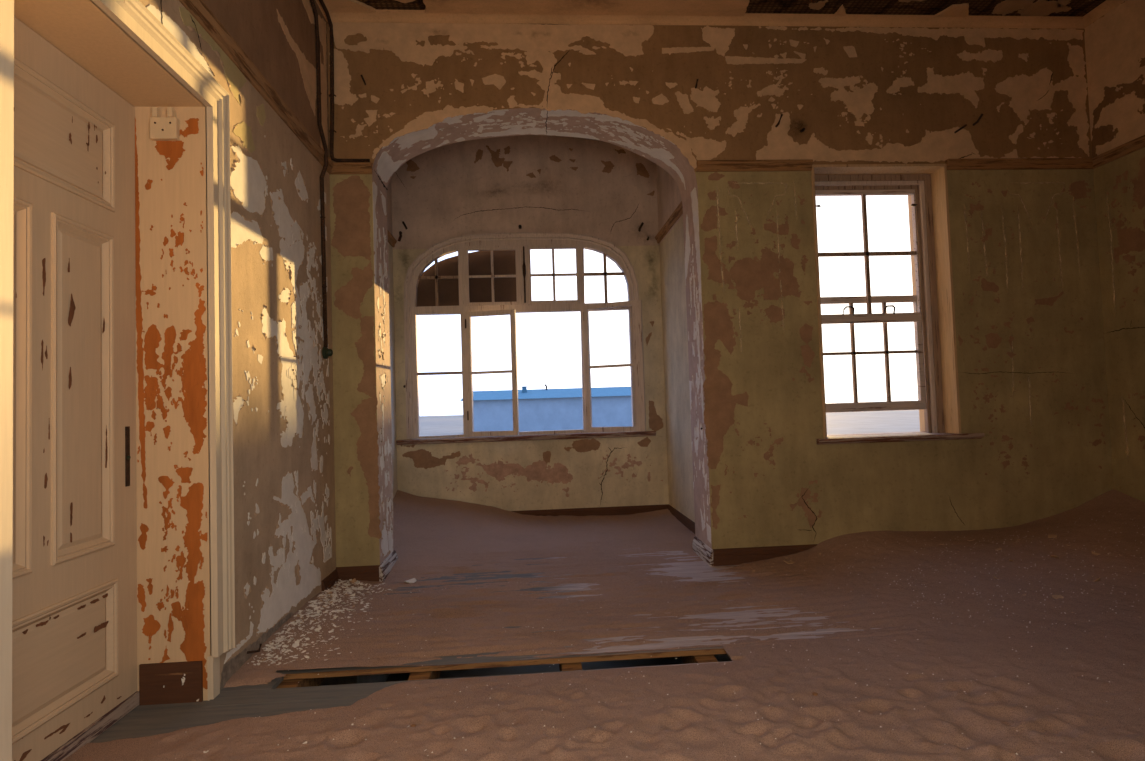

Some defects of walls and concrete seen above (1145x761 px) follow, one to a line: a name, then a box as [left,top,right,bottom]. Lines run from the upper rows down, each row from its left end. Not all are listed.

peeling [135,118,208,701]
peeling [146,4,247,106]
crack [599,447,625,505]
peeling [220,0,1145,691]